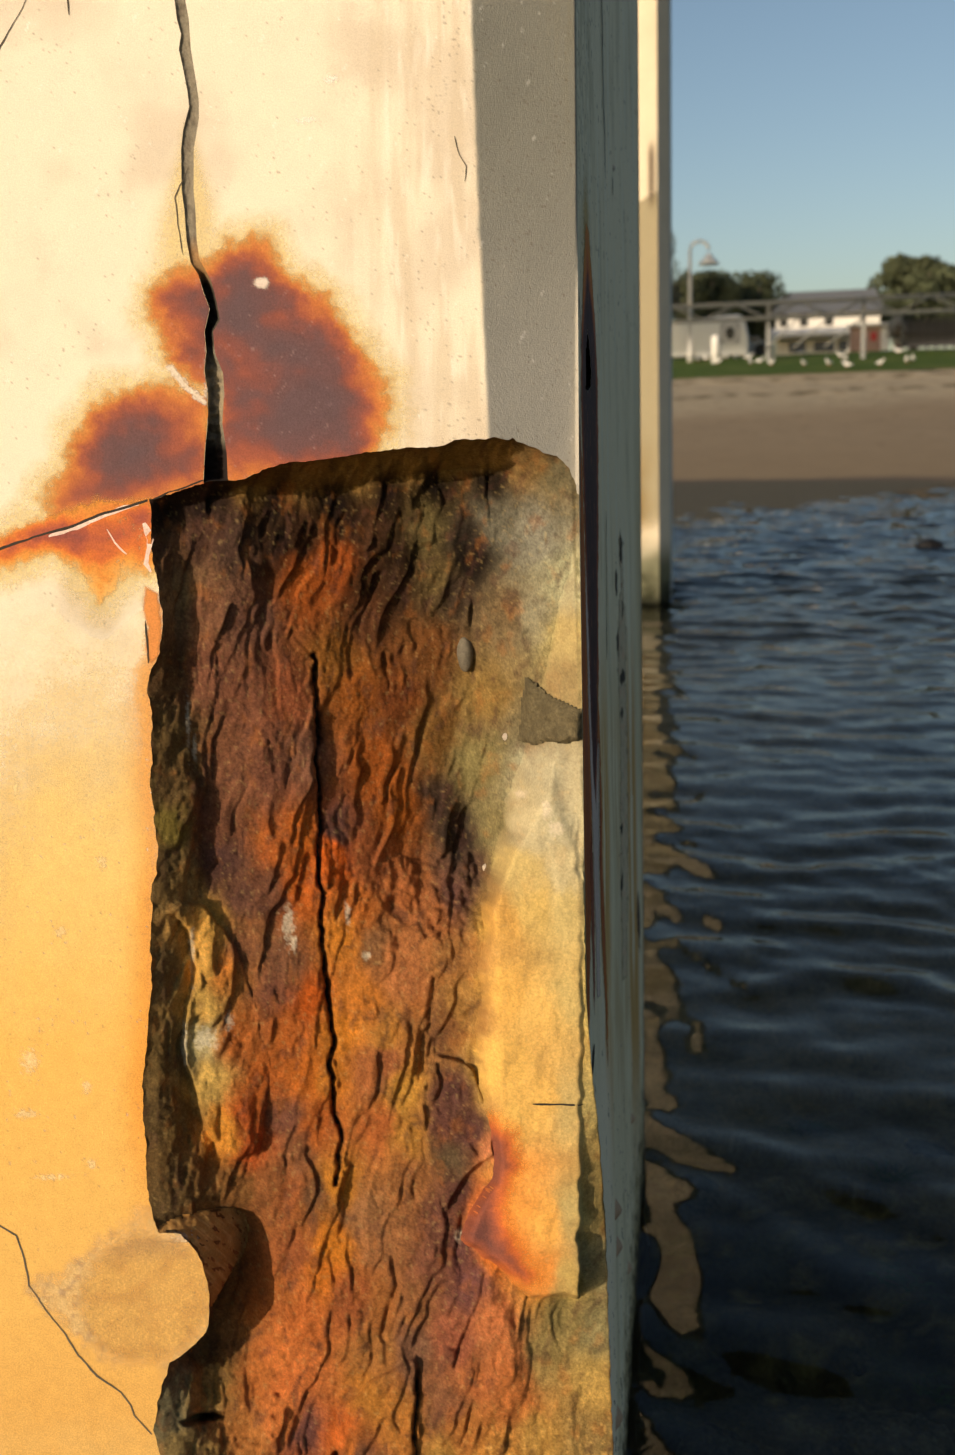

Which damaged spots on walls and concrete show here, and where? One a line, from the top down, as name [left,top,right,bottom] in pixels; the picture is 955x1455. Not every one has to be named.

crack [0,0,228,572]
rust [0,230,392,604]
rust [580,202,608,1059]
crack [0,1225,152,1435]
spalling [142,437,614,1455]
rust [461,1114,538,1287]